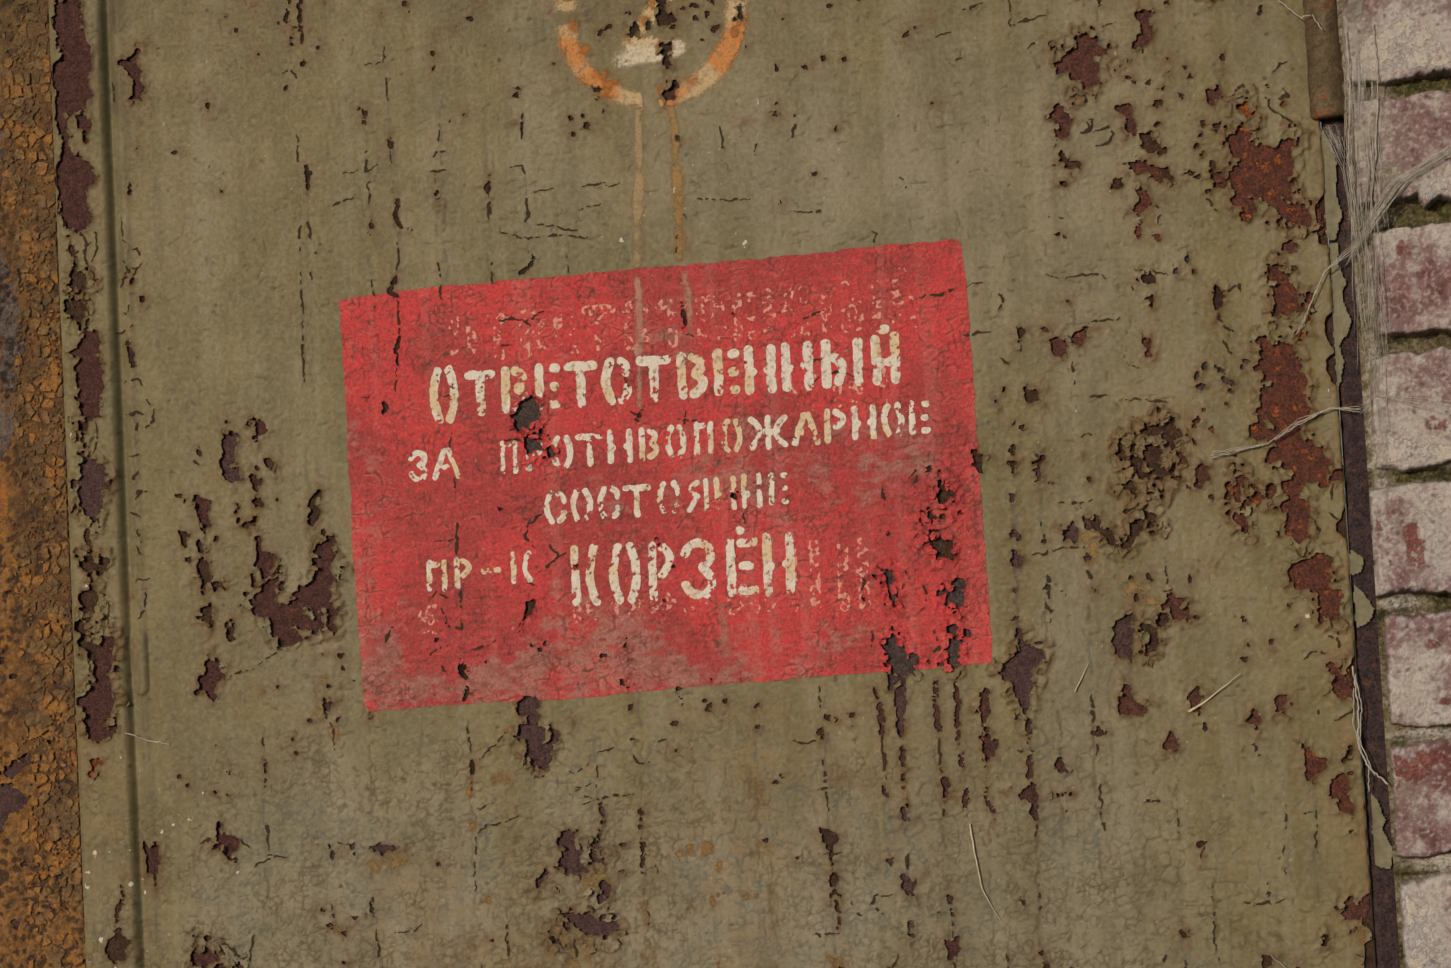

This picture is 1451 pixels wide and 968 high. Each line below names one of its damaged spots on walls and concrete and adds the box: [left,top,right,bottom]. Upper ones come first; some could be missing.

peeling [50,0,129,780]
peeling [999,326,1092,384]
peeling [1044,0,1348,630]
peeling [175,415,345,702]
peeling [513,696,560,772]
peeling [991,616,1048,720]
peeling [1117,684,1150,716]
peeling [1108,566,1199,668]
peeling [1304,651,1356,721]
peeling [0,753,33,833]
peeling [535,765,627,958]
peeling [184,935,248,968]